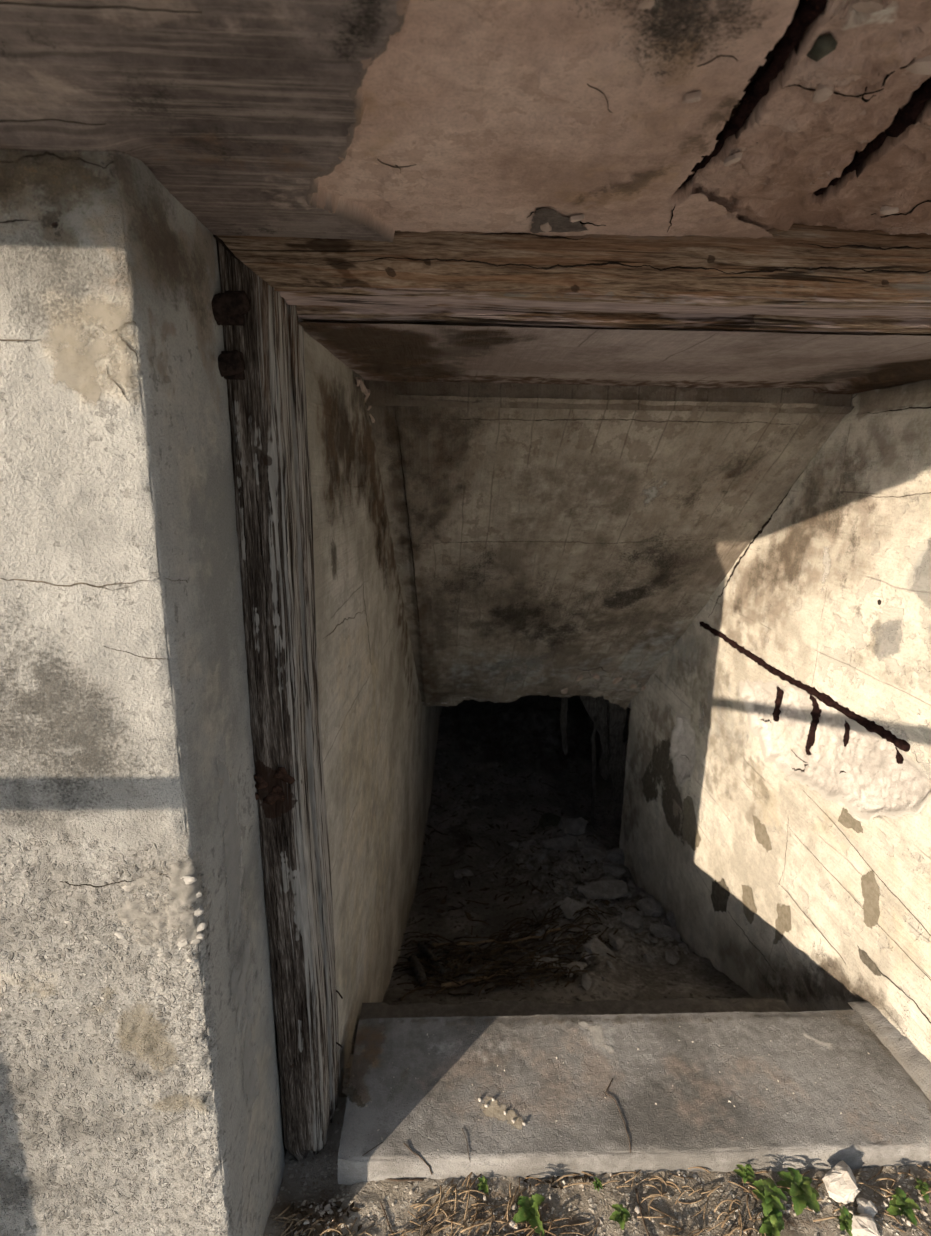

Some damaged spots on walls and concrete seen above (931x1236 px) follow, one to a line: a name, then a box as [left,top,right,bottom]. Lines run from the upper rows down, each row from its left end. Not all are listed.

peeling [305,0,931,242]
leakage [623,0,761,75]
crack [697,55,738,67]
crack [781,49,924,102]
crack [871,200,931,218]
leakage [306,326,512,523]
crack [0,577,188,590]
leakage [477,532,687,650]
leakage [757,474,839,590]
leakage [0,598,154,813]
spalling [699,621,931,833]